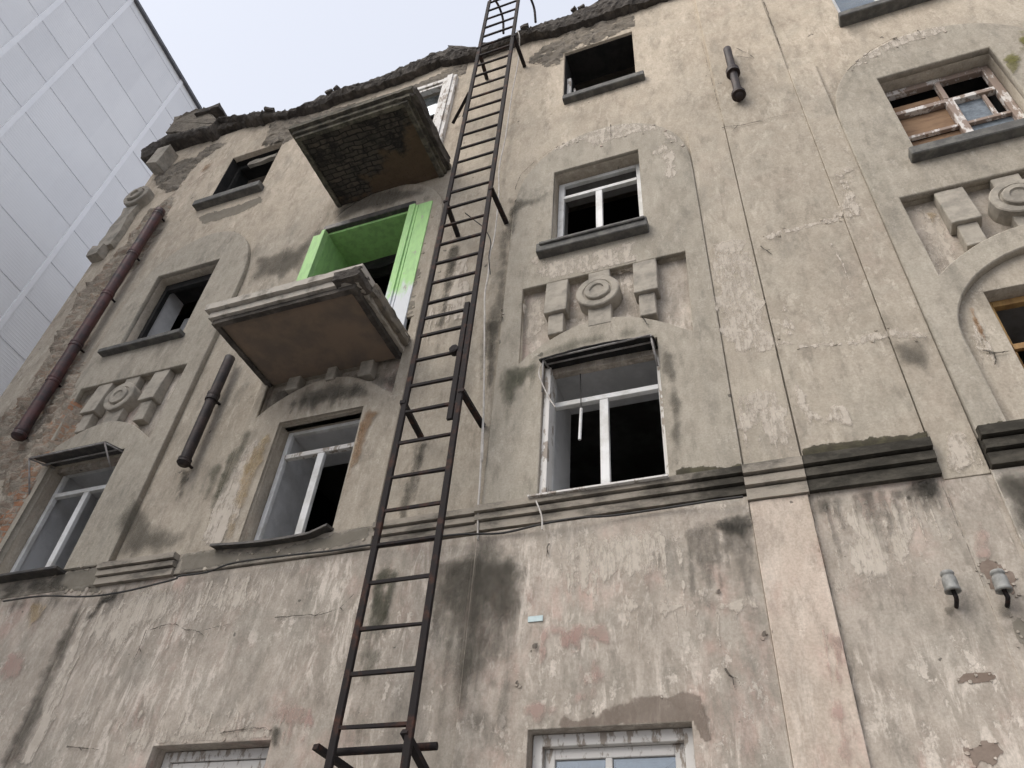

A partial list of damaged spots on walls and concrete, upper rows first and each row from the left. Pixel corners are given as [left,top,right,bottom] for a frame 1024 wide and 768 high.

spalling [527,14,635,67]
peeling [548,124,684,178]
water stain [339,191,411,217]
spalling [0,142,227,542]
water stain [204,439,261,544]
water stain [824,494,953,590]
peeling [975,559,1021,598]
peeling [957,672,996,684]
peeling [560,692,711,741]
peeling [963,739,1003,768]